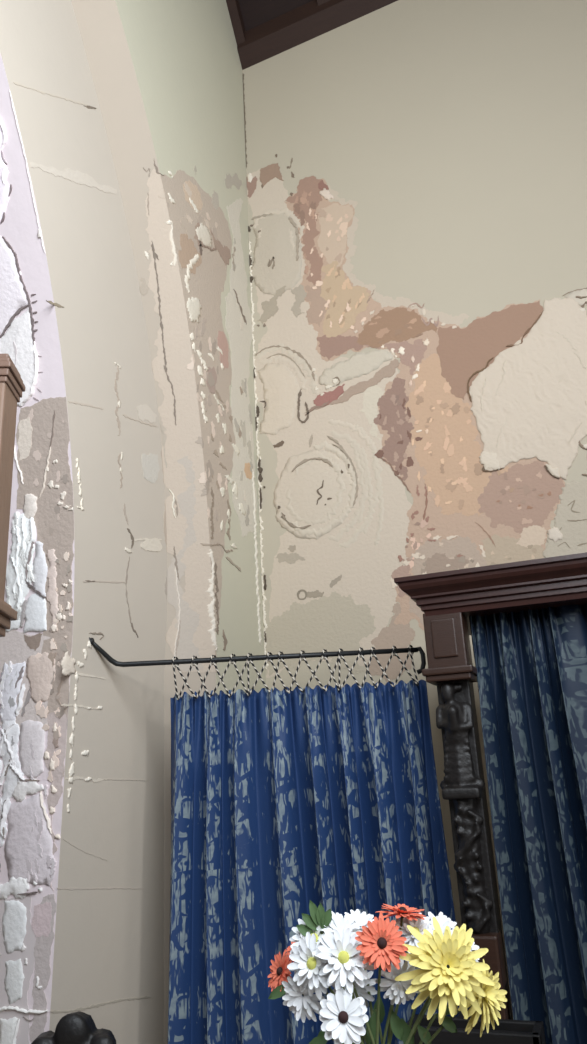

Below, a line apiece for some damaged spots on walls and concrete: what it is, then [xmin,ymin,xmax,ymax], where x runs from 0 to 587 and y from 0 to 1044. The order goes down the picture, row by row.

crack [241,74,249,167]
crack [0,151,64,449]
flaking render [0,126,74,886]
crack [151,241,176,468]
flaking render [189,154,289,549]
crack [255,345,358,529]
crack [380,457,428,520]
peeling [284,176,587,576]
crack [467,288,587,402]
flaking render [390,578,424,630]
peeling [2,900,42,1004]